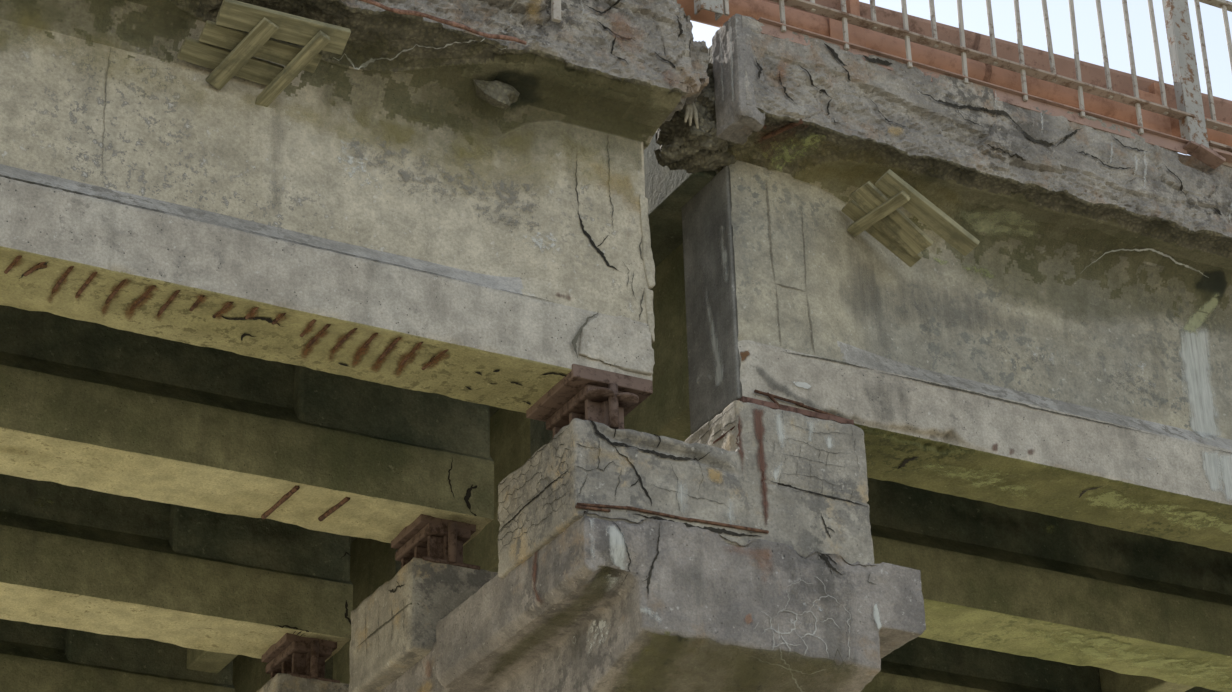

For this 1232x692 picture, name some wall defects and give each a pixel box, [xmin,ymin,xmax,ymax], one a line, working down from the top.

crack [918,90,1185,194]
corrosion [102,280,129,314]
corrosion [126,286,157,320]
crack [0,174,549,301]
corrosion [301,323,448,375]
crack [575,137,644,320]
crack [767,187,1158,436]
water stain [1180,294,1219,437]
crack [448,406,762,594]
corrosion [713,409,768,525]
crack [753,411,877,657]
water stain [1204,452,1232,499]